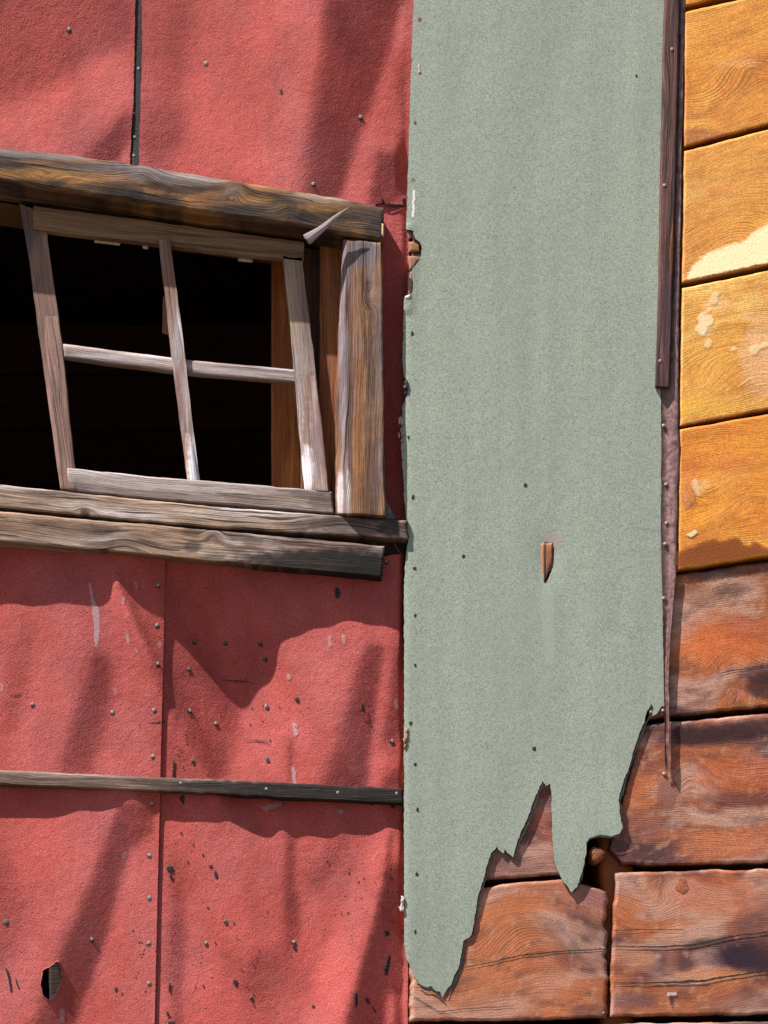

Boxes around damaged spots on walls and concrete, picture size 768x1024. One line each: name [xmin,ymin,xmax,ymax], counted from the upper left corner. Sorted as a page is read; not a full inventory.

peeling [405,271,413,299]